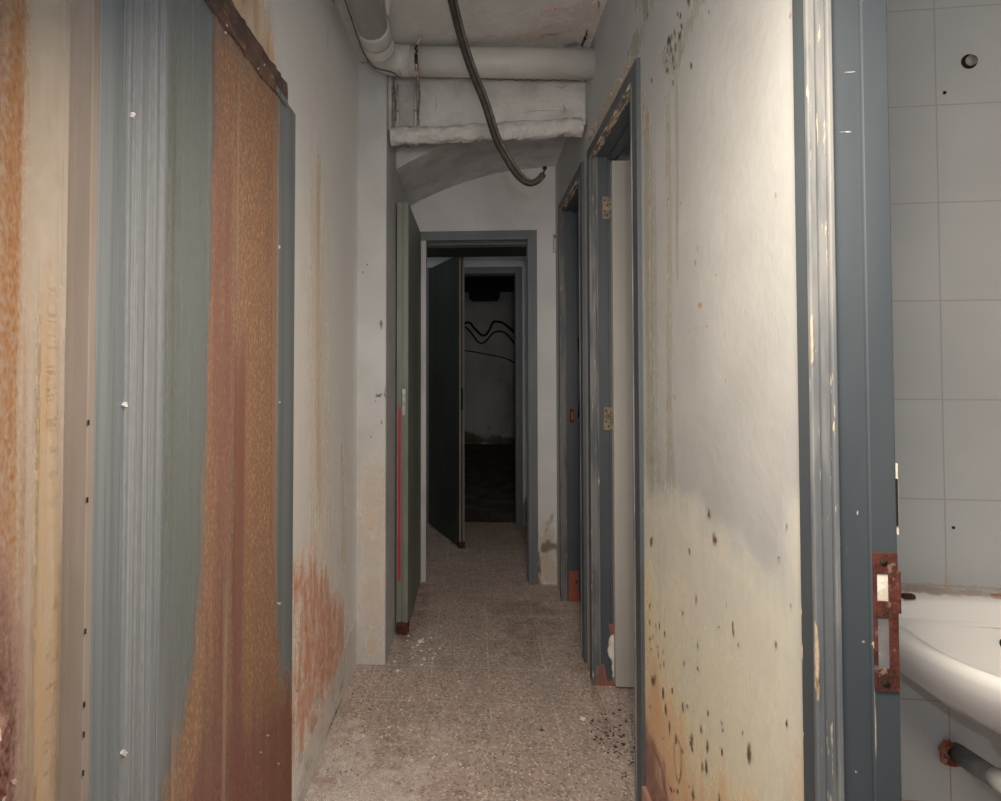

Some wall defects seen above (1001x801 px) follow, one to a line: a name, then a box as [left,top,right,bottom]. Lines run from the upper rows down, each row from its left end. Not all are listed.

rust [0,0,71,801]
rust [164,16,345,801]
water stain [643,0,804,801]